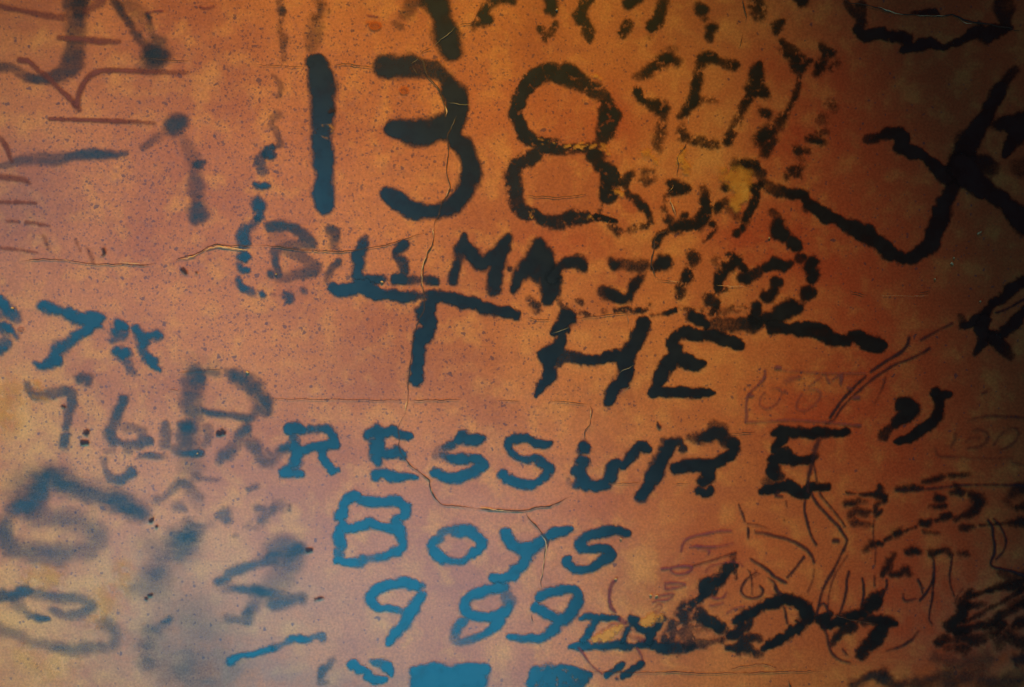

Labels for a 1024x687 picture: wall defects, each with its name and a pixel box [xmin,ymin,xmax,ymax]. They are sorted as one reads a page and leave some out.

crack [26,4,566,591]
crack [558,401,593,467]